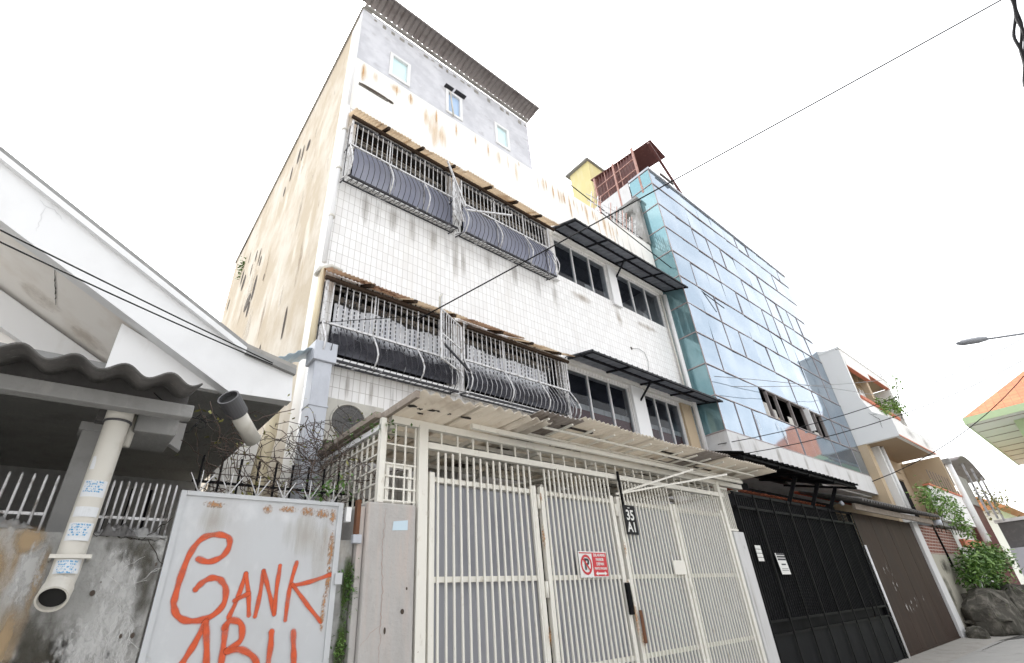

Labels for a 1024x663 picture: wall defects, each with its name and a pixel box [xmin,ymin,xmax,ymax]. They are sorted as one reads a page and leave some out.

damp [0,529,157,663]
rust [264,505,336,629]